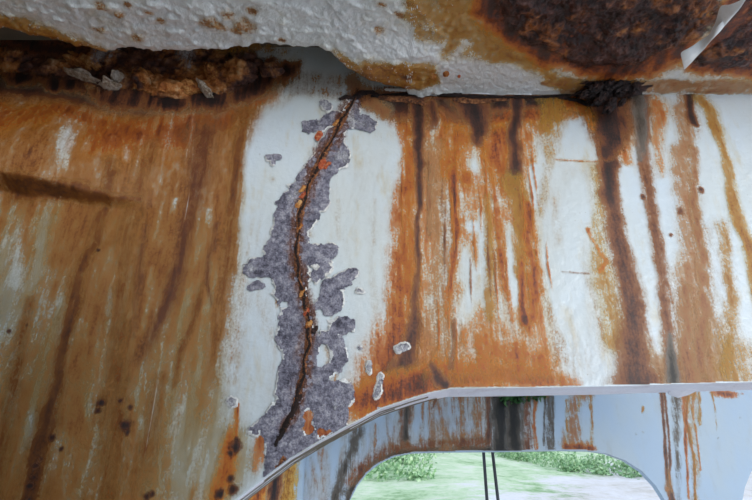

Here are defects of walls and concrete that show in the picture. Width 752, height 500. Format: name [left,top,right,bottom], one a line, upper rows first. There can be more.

spalling [0,40,302,118]
spalling [468,0,752,82]
corrosion [312,0,752,441]
corrosion [0,73,283,500]
peeling [243,99,378,477]
corrosion [303,410,332,437]
peeling [365,360,385,409]
peeling [393,341,411,354]
crack [241,88,592,500]
corrosion [561,395,597,451]
corrosion [659,393,675,500]
corrosion [681,392,702,500]